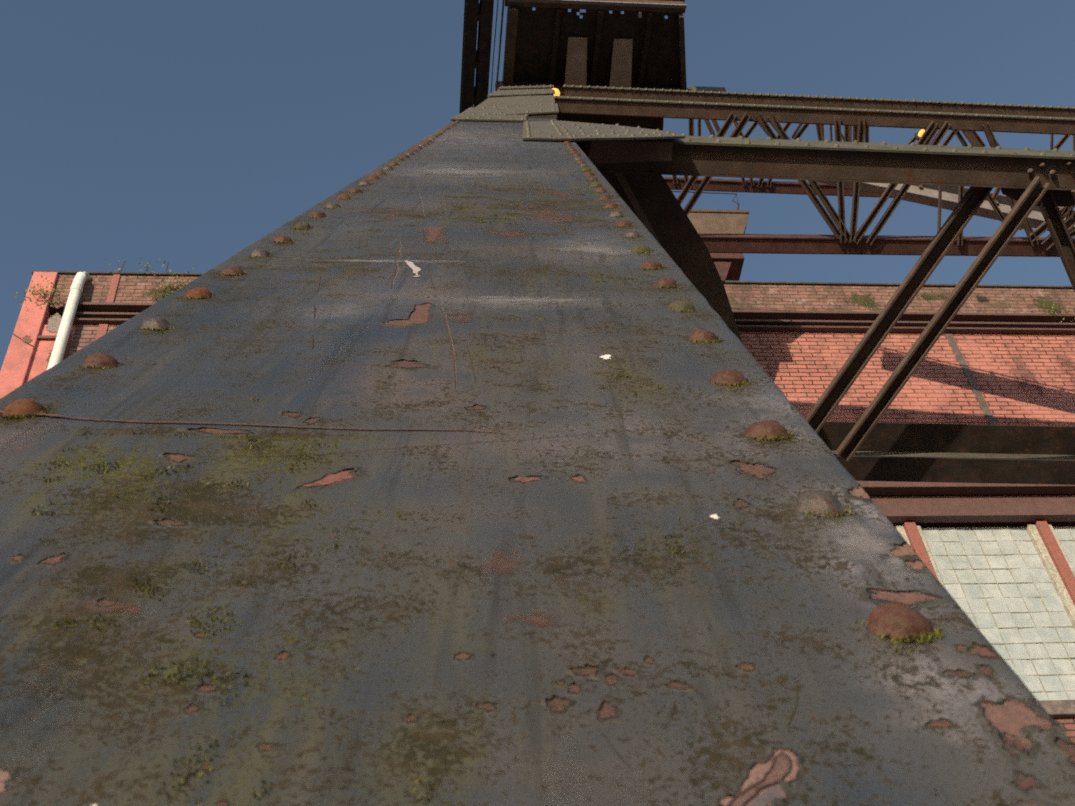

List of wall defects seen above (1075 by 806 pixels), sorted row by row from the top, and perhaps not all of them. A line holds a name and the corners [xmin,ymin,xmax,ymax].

peeling [379,302,436,328]
peeling [879,541,929,574]
peeling [852,587,954,612]
peeling [972,695,1069,760]
peeling [711,746,806,806]